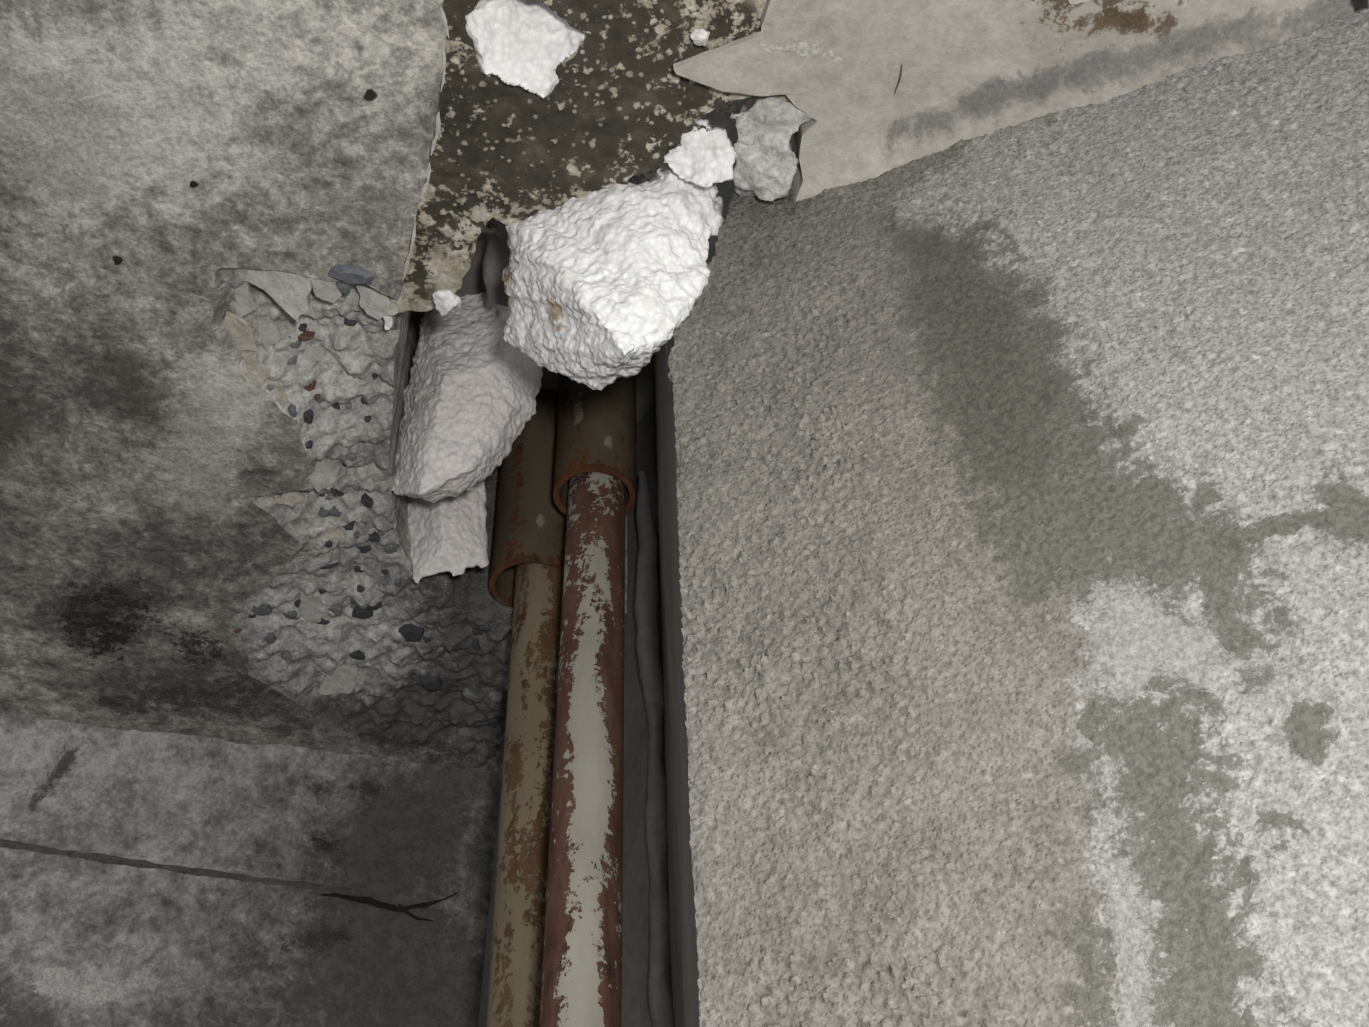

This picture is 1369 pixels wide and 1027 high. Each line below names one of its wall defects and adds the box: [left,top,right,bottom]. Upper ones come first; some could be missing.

water stain [0,49,138,204]
spalling [363,89,377,101]
spalling [421,112,441,200]
spalling [439,7,449,91]
spalling [466,0,585,99]
peeling [673,26,842,96]
water stain [167,401,245,513]
spalling [211,217,513,770]
water stain [45,573,279,724]
water stain [913,194,1369,1027]
crack [0,837,459,922]